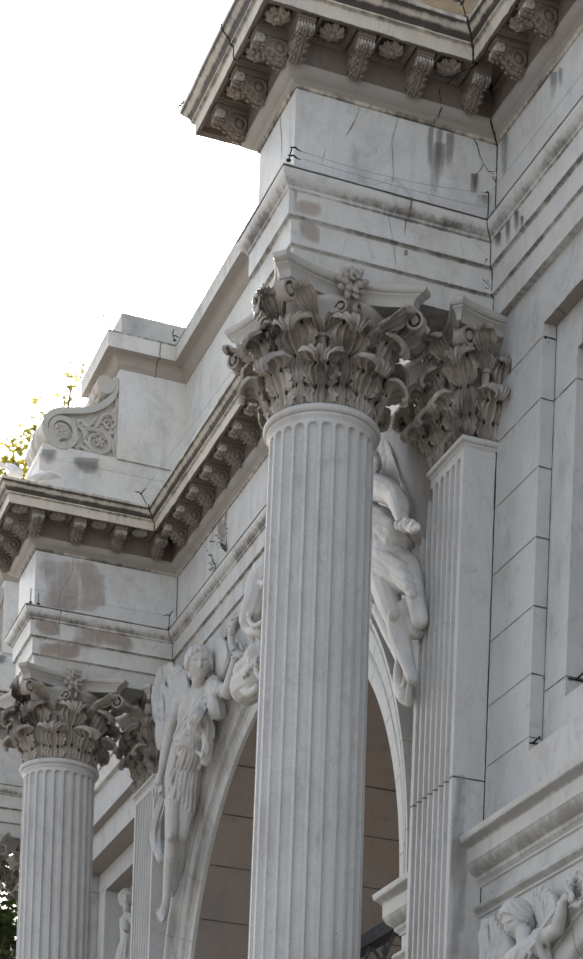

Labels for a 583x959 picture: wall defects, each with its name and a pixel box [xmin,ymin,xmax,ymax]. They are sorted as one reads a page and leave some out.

crack [389,117,412,266]
crack [434,16,498,311]